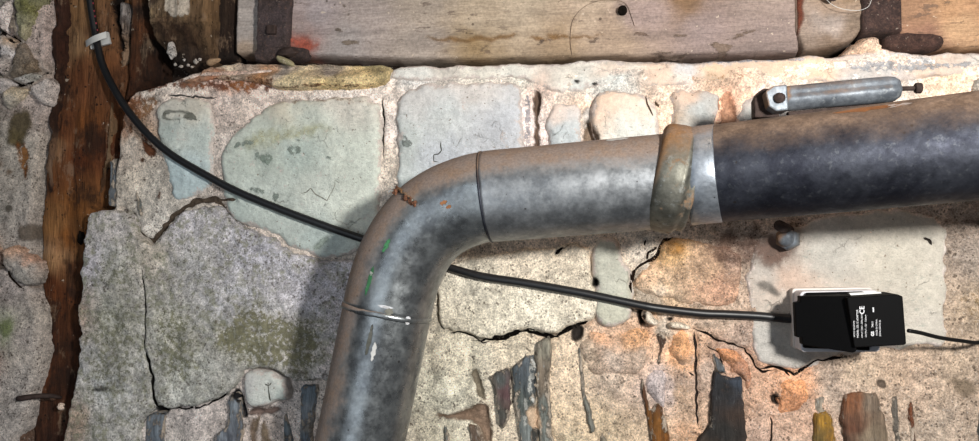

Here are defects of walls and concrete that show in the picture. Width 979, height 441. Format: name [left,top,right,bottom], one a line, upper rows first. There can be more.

crack [124,196,236,243]
crack [629,237,673,293]
crack [142,270,227,422]
crack [452,320,590,344]
crack [689,328,843,427]